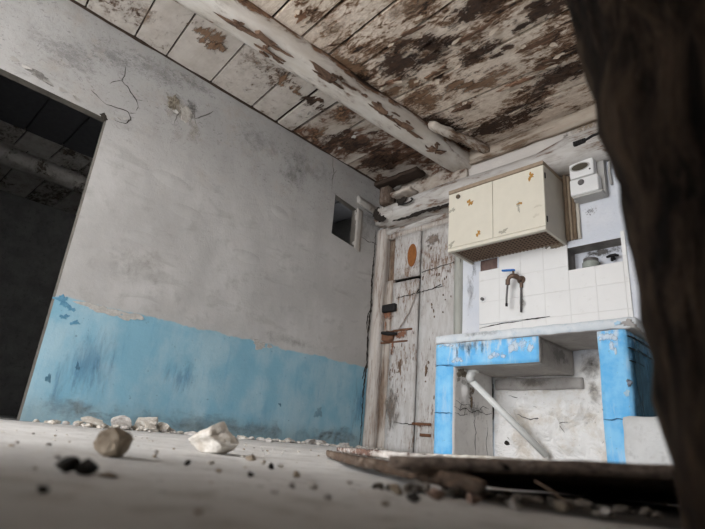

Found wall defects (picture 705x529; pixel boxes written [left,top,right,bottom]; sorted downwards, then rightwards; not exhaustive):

crack [92,67,142,124]
peeling [214,12,294,64]
peeling [294,0,311,28]
peeling [310,60,446,155]
peeling [387,15,432,54]
peeling [378,62,462,90]
peeling [451,99,479,115]
peeling [448,20,499,48]
peeling [496,29,567,93]
peeling [53,294,144,325]
crack [359,234,377,445]
crack [434,388,494,455]